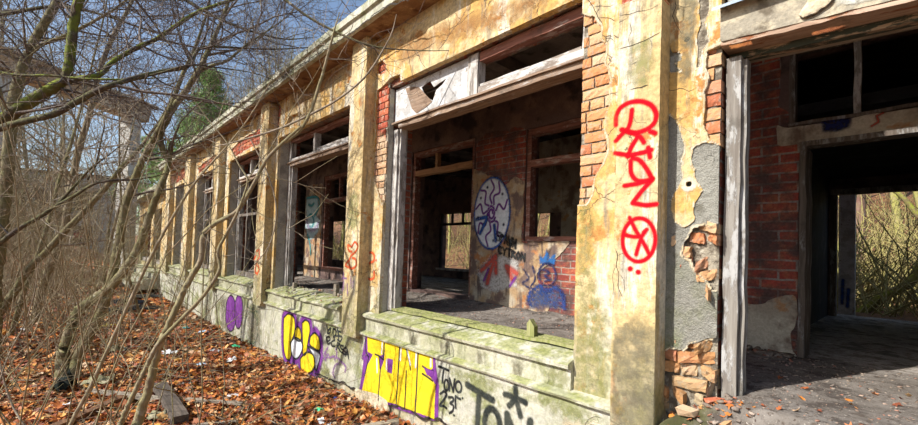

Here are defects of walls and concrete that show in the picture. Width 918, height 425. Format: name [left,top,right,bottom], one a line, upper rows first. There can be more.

flaking render [372,59,401,208]
flaking render [577,12,611,206]
peeling [663,0,726,421]
damp [614,327,653,425]